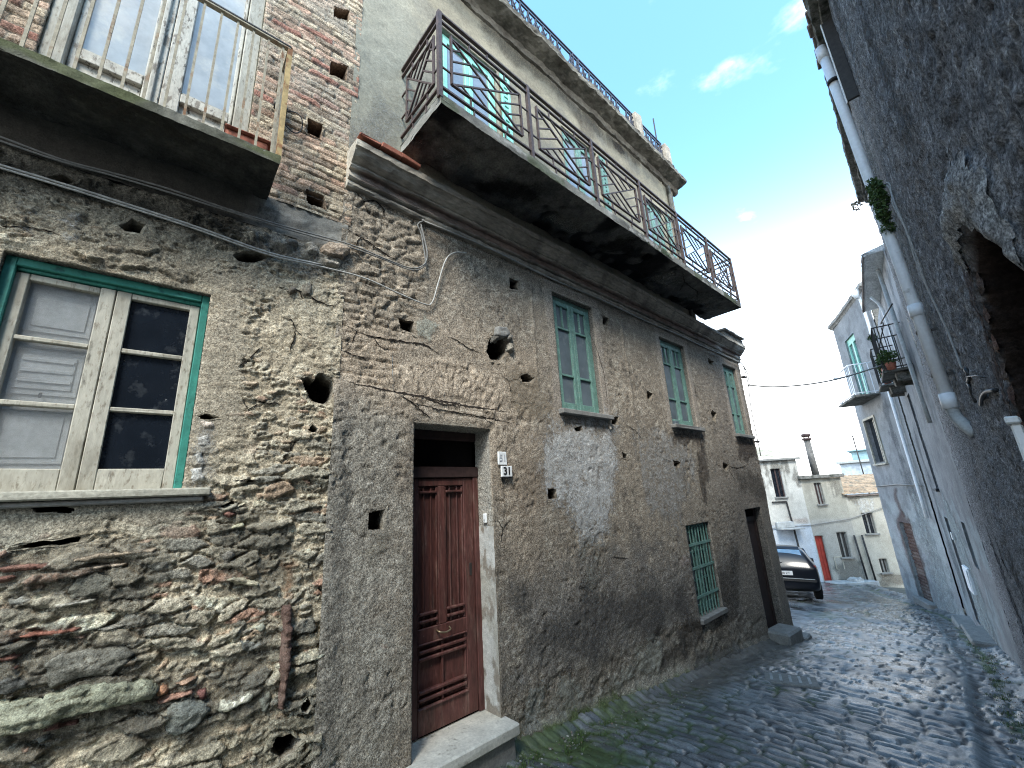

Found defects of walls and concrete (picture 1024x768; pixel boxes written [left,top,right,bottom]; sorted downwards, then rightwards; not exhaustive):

crack [276,286,535,425]
hole [21,506,86,515]
spalling [0,533,169,609]
spalling [205,497,291,594]
spalling [0,621,272,768]
hole [261,728,310,768]